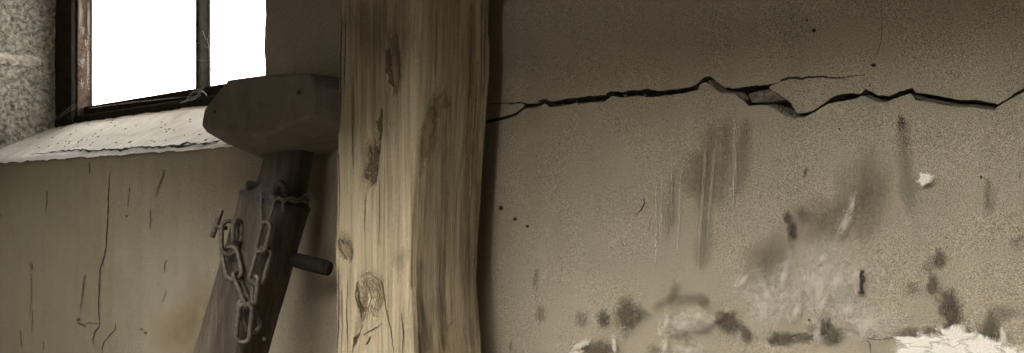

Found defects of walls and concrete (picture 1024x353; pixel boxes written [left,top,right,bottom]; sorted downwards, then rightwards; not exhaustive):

crack [486,75,1024,123]
water stain [816,186,872,233]
crack [35,140,220,352]
water stain [653,249,1005,353]
water stain [570,334,625,353]
flaking render [894,325,1024,353]